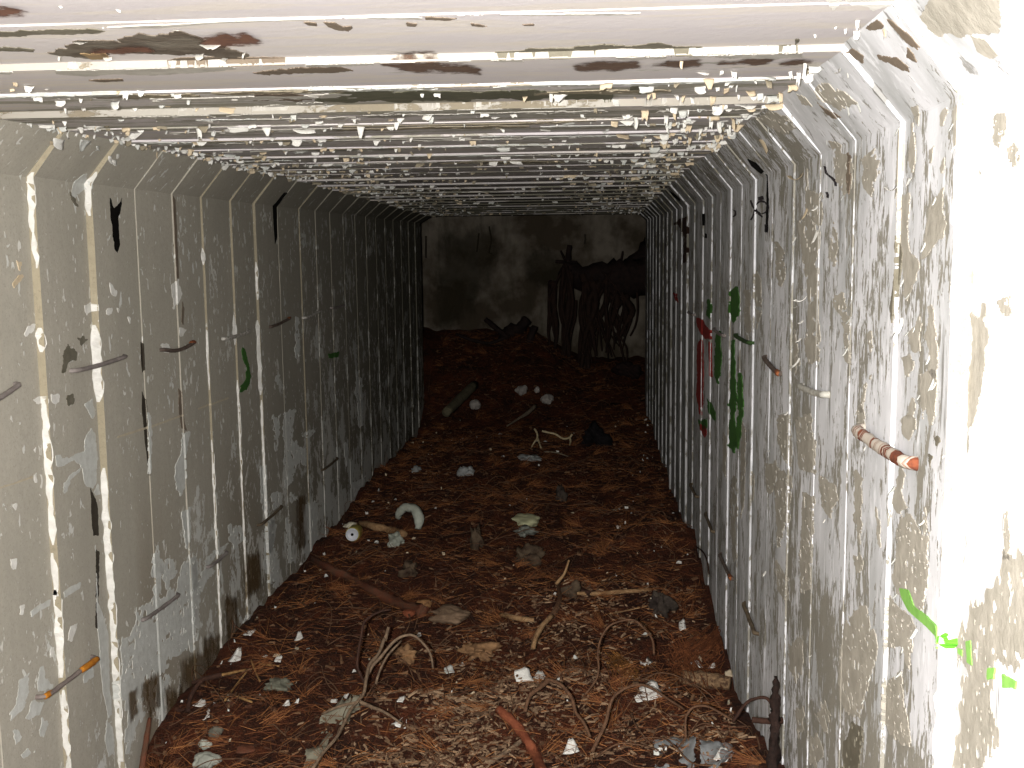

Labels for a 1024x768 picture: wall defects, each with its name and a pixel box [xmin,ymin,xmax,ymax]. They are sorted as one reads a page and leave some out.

corrosion [92,46,155,55]
corrosion [200,32,261,48]
peeling [0,12,861,217]
peeling [826,0,920,72]
peeling [26,172,39,268]
peeling [743,270,762,340]
peeling [774,168,852,374]
peeling [826,100,1021,468]
peeling [9,279,246,768]
peeling [256,320,319,588]
corrosion [851,423,919,471]
peeling [838,467,1024,768]